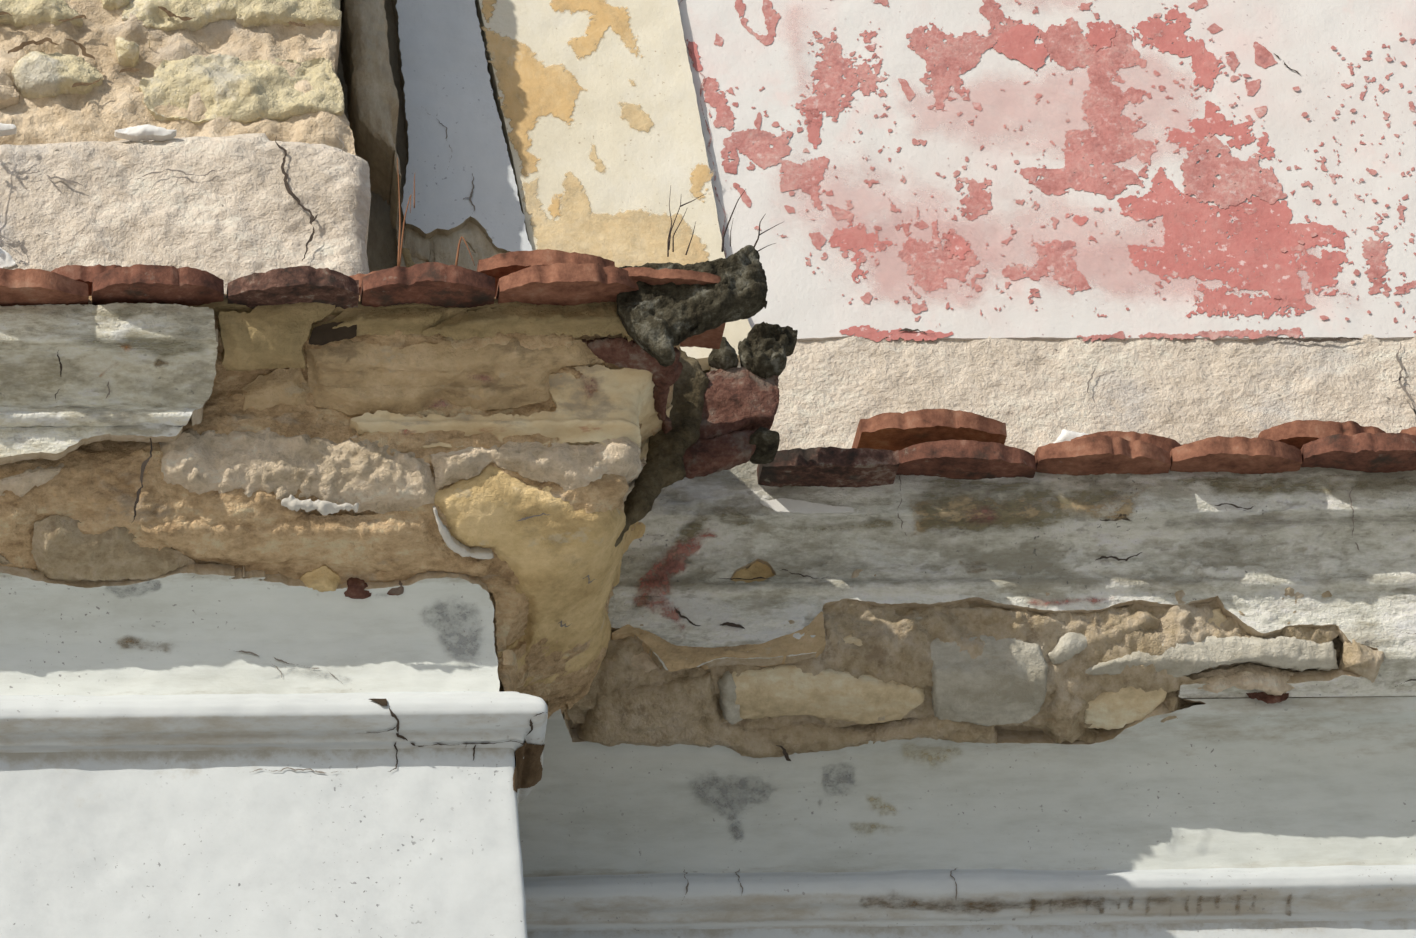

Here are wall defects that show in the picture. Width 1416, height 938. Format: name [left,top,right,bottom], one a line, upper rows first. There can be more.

crack [275,137,318,261]
peeling [481,0,709,268]
peeling [687,0,1416,342]
crack [1267,335,1365,343]
crack [1392,342,1416,421]
spalling [0,294,1384,761]
crack [229,649,544,772]
spalling [513,739,545,793]